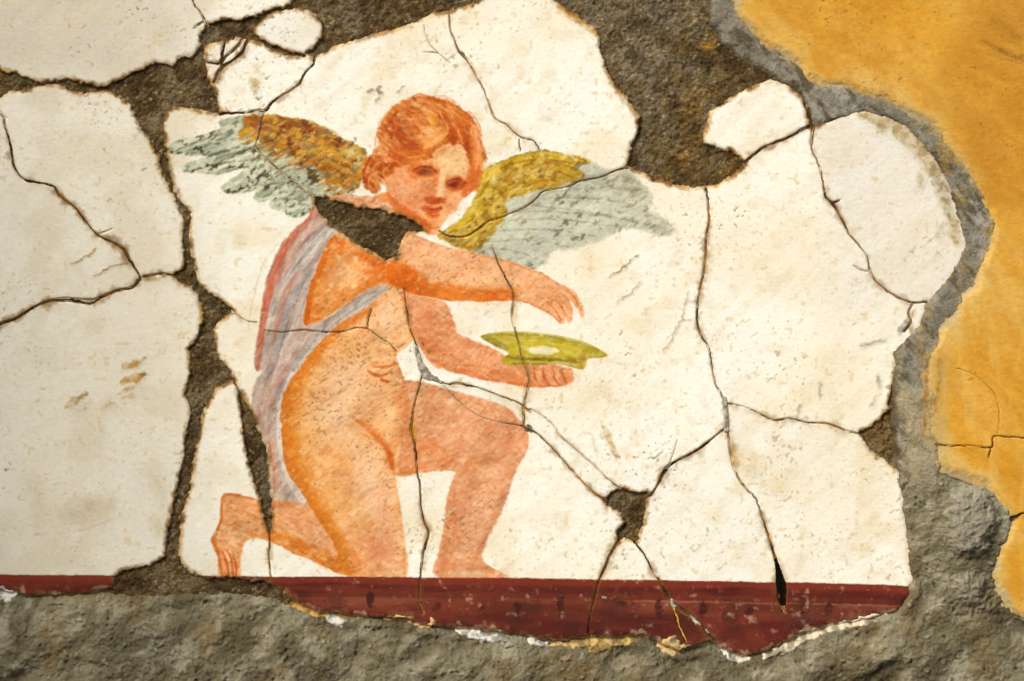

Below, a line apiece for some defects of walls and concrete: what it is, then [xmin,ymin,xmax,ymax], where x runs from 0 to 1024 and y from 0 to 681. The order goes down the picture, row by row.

crack [190,0,320,198]
crack [421,12,542,152]
flaking render [549,0,826,193]
crack [0,113,178,333]
flaking render [0,0,489,628]
crack [230,163,863,619]
crack [742,106,931,333]
flaking render [455,628,510,643]
flaking render [527,634,644,655]
flaking render [599,483,653,545]
crack [584,534,717,643]
flaking render [721,612,889,664]